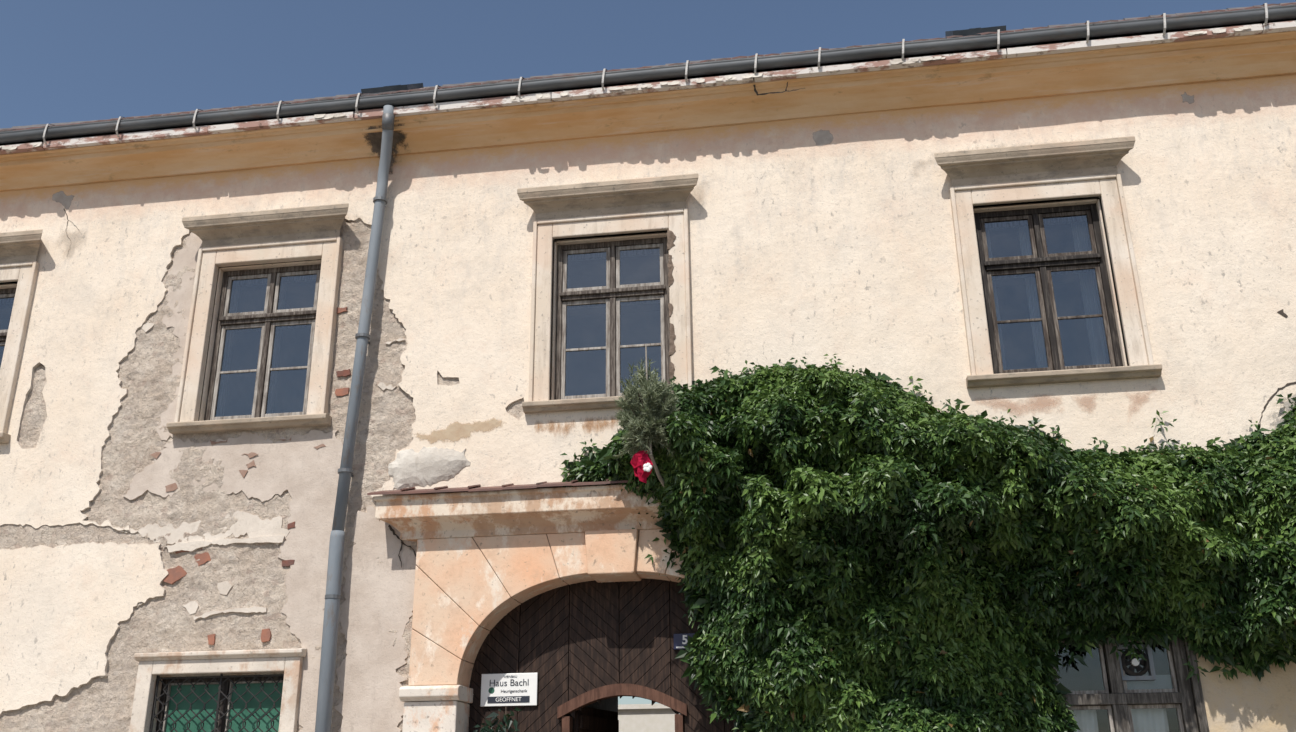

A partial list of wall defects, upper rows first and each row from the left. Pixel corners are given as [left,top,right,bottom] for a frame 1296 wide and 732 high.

damp [364,120,406,174]
spalling [0,219,524,732]